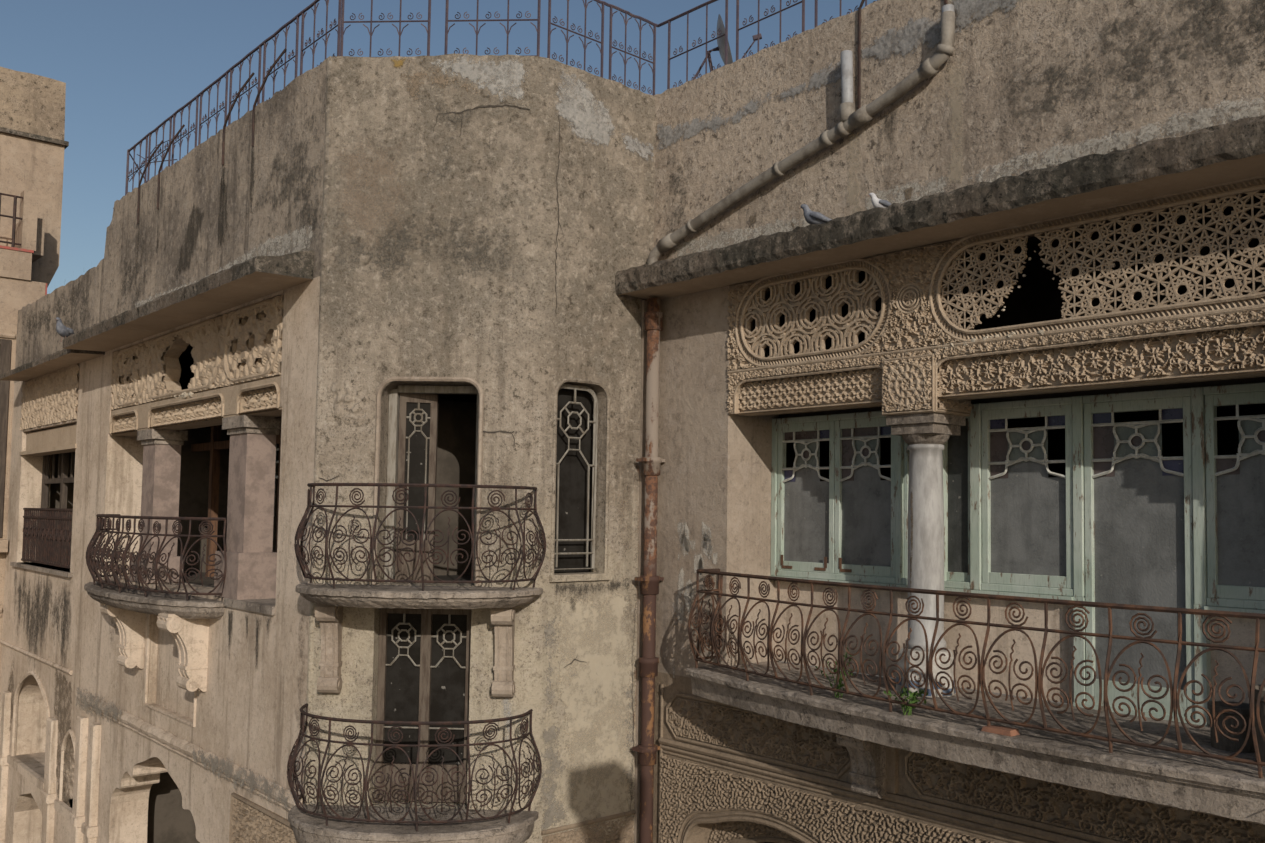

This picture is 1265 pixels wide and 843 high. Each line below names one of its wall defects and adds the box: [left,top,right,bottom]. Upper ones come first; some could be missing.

crack [433,104,530,137]
water stain [1003,0,1265,124]
crack [555,121,564,308]
water stain [15,573,71,659]